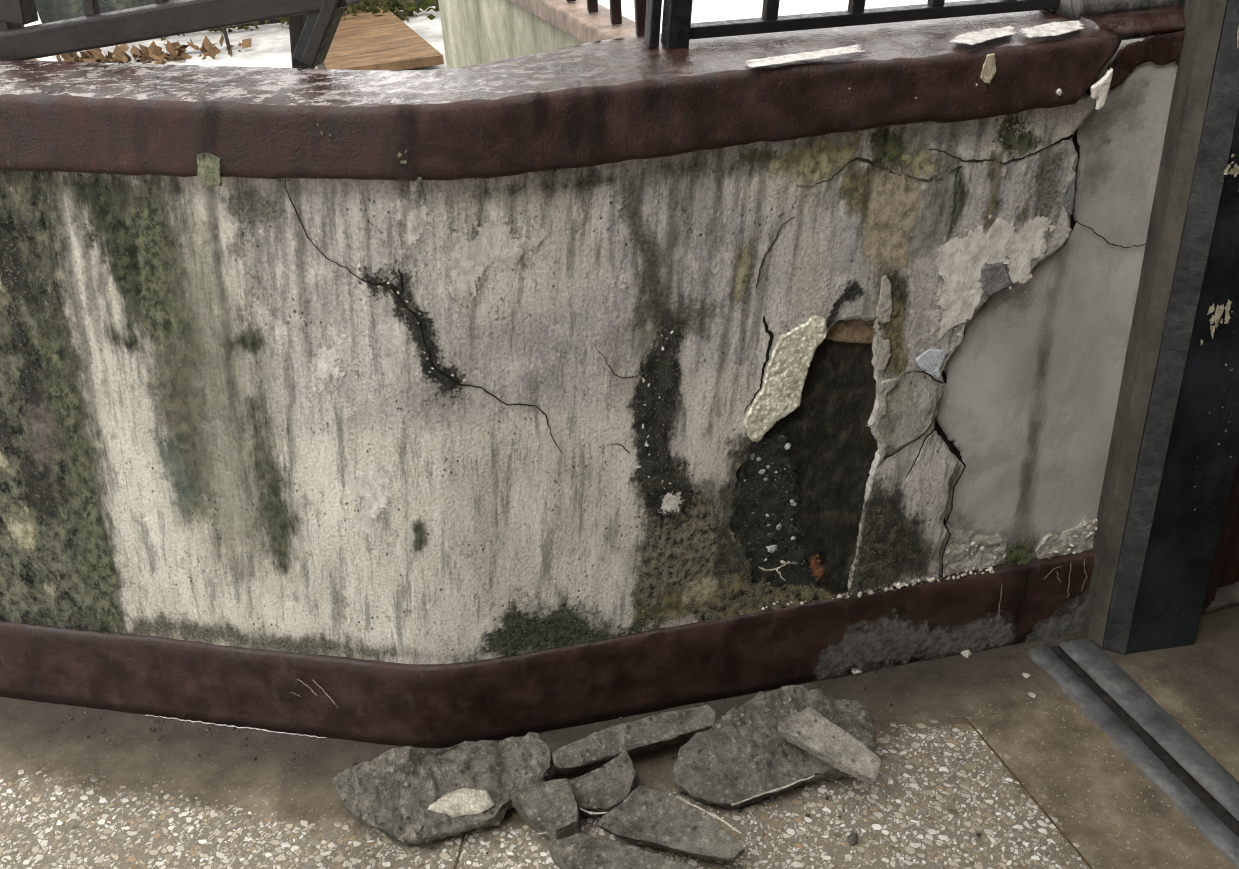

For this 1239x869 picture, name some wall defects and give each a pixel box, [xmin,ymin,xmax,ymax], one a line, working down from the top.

peeling [980,53,996,84]
water stain [223,326,264,354]
crack [285,178,563,455]
crack [744,217,795,413]
water stain [863,160,958,304]
crack [797,129,1147,268]
peeling [934,215,1056,340]
peeling [1201,300,1232,345]
water stain [8,507,35,551]
water stain [625,310,735,613]
spalling [683,275,1007,625]
crack [934,369,966,582]